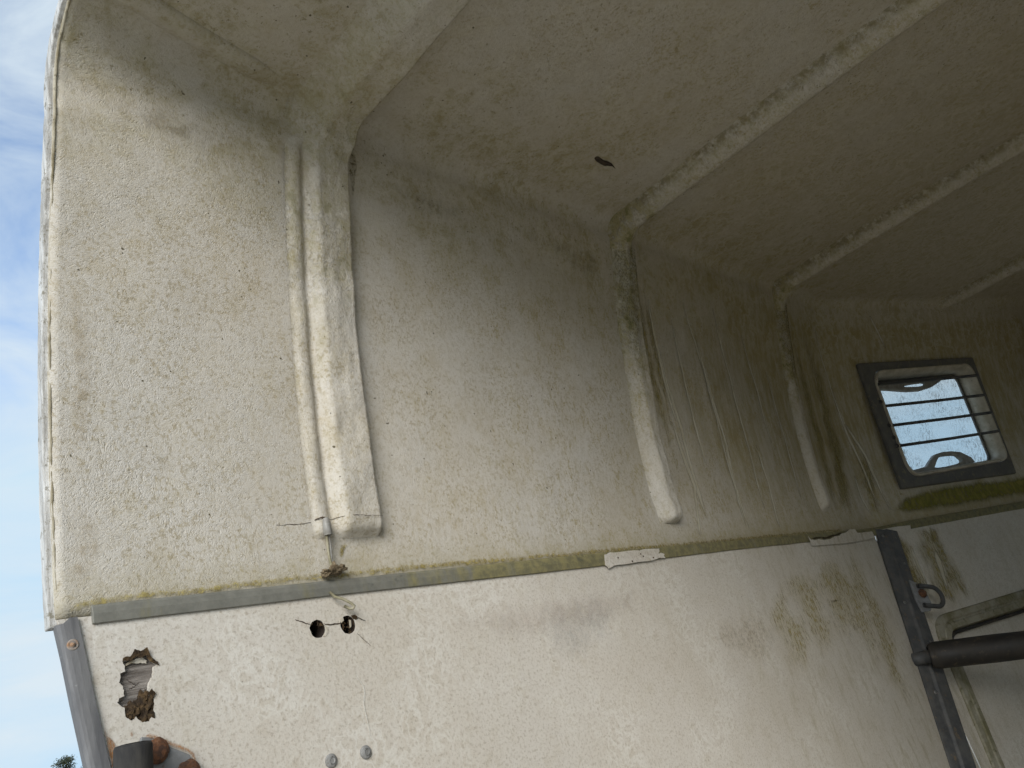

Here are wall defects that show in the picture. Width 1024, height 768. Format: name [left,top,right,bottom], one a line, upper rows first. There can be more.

crack [286,514,383,525]
spalling [117,647,159,722]